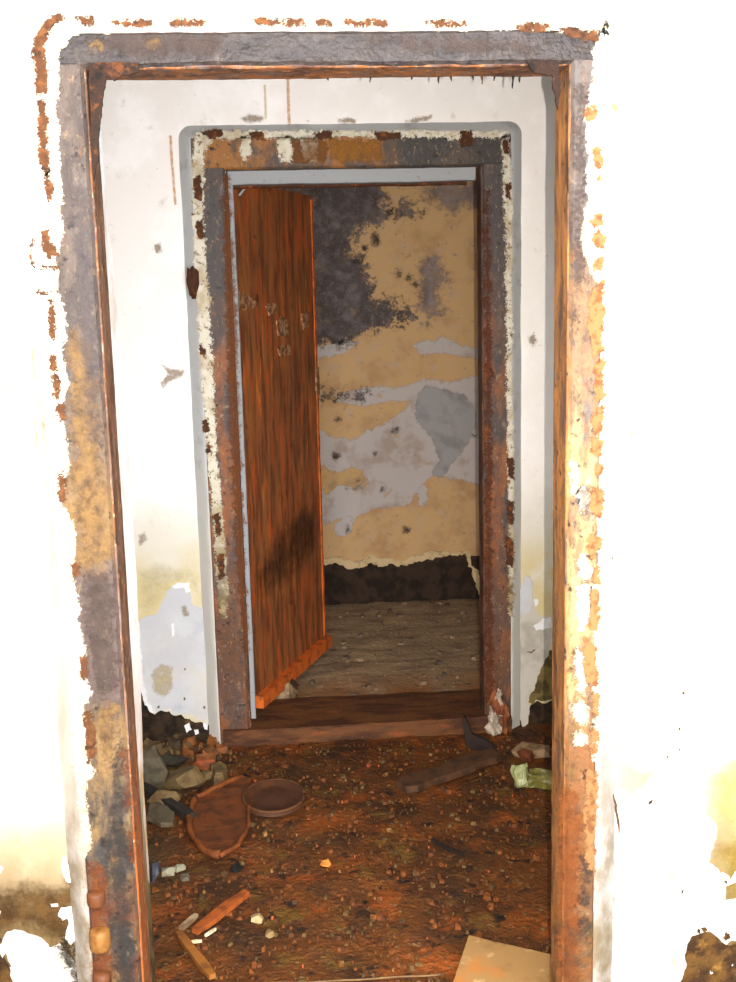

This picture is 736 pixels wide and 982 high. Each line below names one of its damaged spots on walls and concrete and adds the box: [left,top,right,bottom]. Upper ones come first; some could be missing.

rust [30,12,65,202]
rust [88,61,140,190]
rust [212,175,467,652]
mould [277,179,477,351]
peeling [320,375,479,538]
peeling [413,335,478,360]
rust [587,211,607,519]
peeling [138,582,209,744]
rust [567,534,604,872]
flaking render [0,903,77,982]
flaking render [611,775,736,982]
leakage [716,764,736,888]